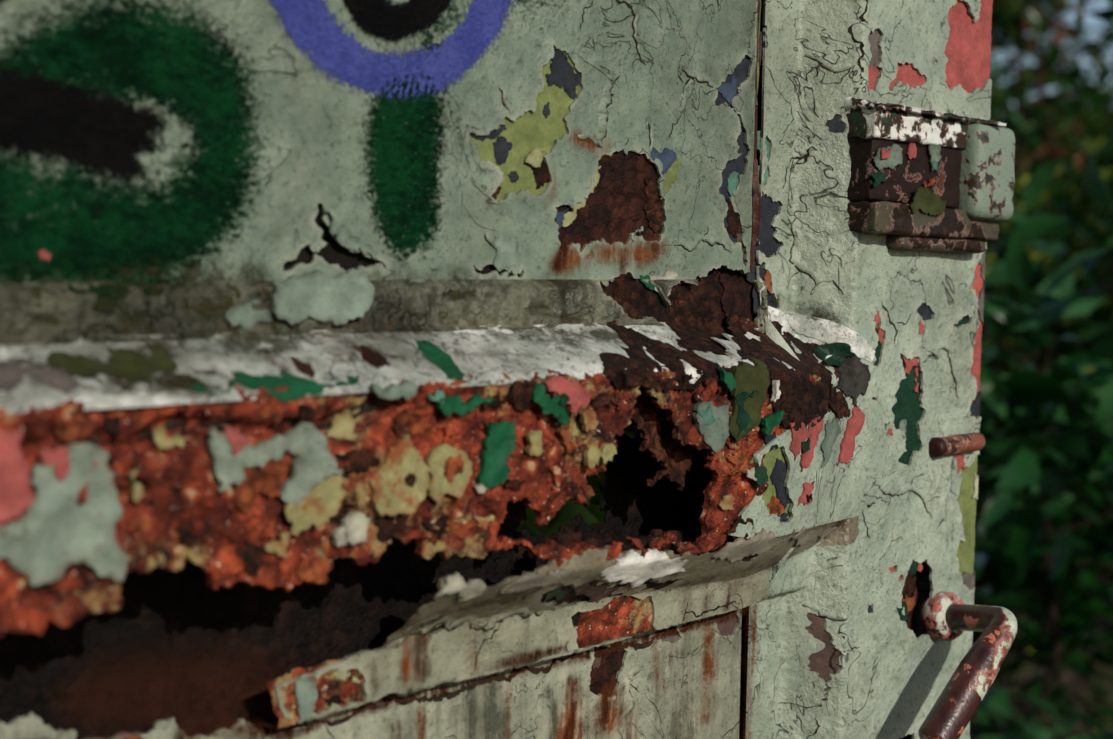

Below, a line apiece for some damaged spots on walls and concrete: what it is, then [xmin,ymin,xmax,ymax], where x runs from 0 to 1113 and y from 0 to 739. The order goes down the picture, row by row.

peeling [469,49,581,202]
crack [575,0,714,149]
crack [804,0,872,91]
peeling [187,339,495,417]
rust [553,133,833,491]
peeling [693,32,884,562]
peeling [884,353,923,465]
spalling [0,375,696,739]
rust [553,524,701,554]
crack [293,600,744,739]
rust [402,578,741,739]
crack [778,602,860,739]